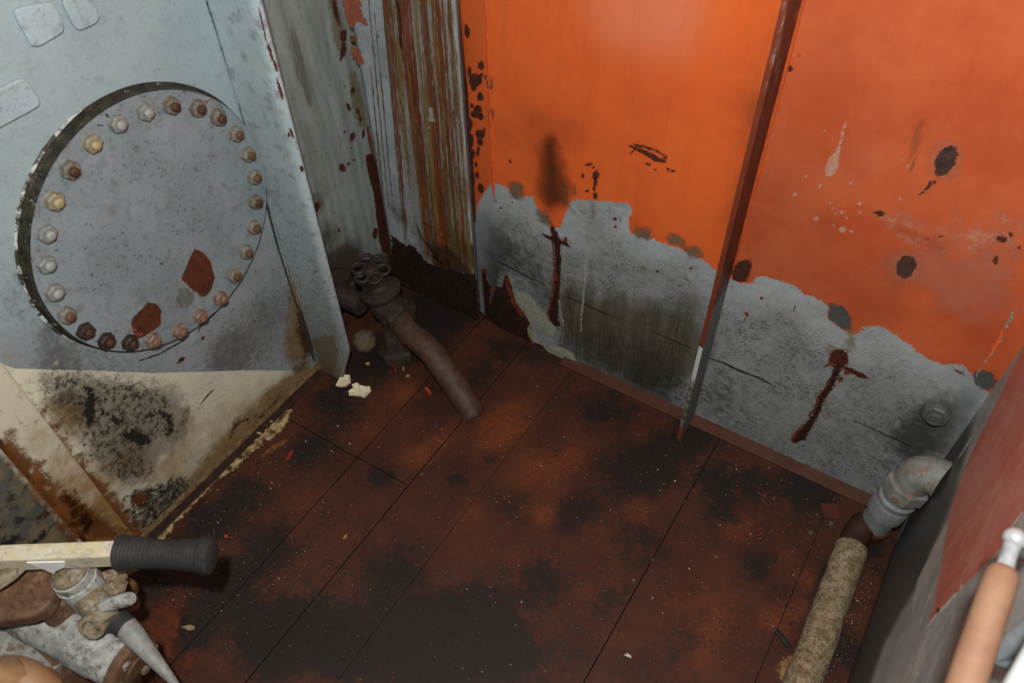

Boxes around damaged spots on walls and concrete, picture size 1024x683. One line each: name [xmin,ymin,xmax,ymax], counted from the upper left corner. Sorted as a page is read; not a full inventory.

rust [366,0,481,321]
spalling [630,143,675,173]
rust [189,276,314,486]
peeling [482,269,577,361]
rust [542,225,571,327]
rust [785,349,868,443]
peeling [953,312,1014,378]
rust [1,393,144,542]
mould [43,369,188,531]